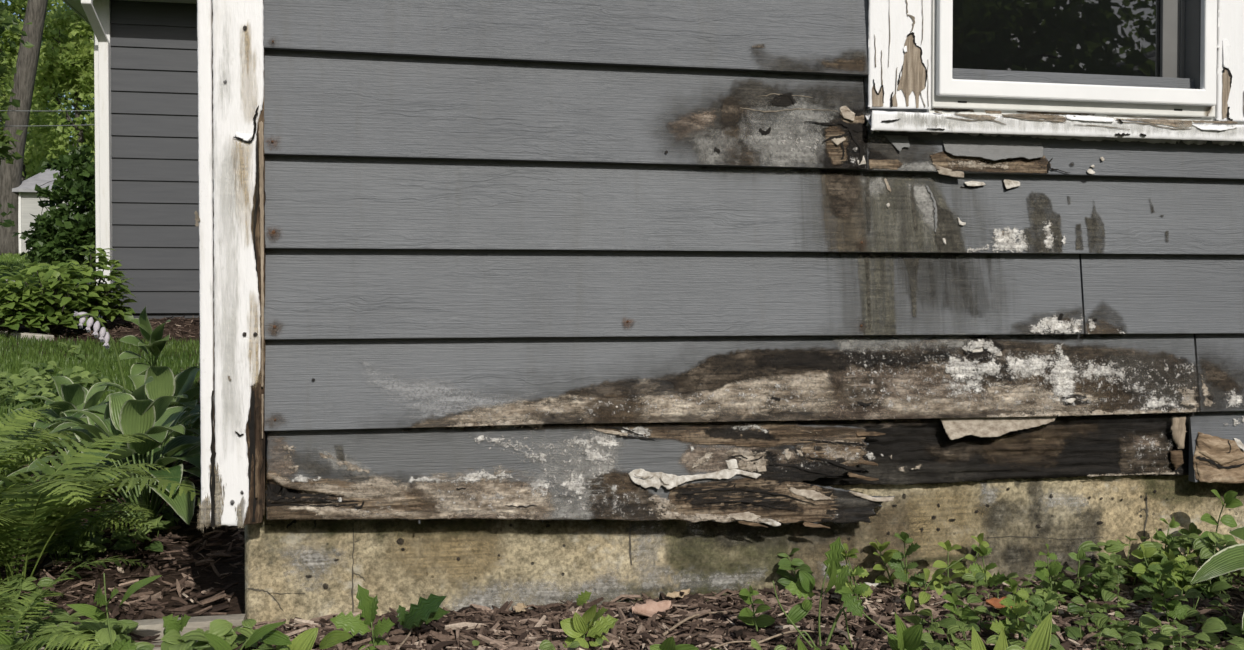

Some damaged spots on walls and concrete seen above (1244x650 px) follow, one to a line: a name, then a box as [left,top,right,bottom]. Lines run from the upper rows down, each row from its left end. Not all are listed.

water stain [774,51,867,74]
peeling [840,106,855,121]
peeling [872,32,1244,191]
water stain [404,81,1244,556]
peeling [962,336,1004,361]
peeling [940,394,1091,440]
peeling [628,444,769,490]
peeling [785,446,822,460]
spalling [400,466,554,528]
water stain [402,529,496,577]
water stain [689,479,1101,594]
water stain [453,576,627,611]